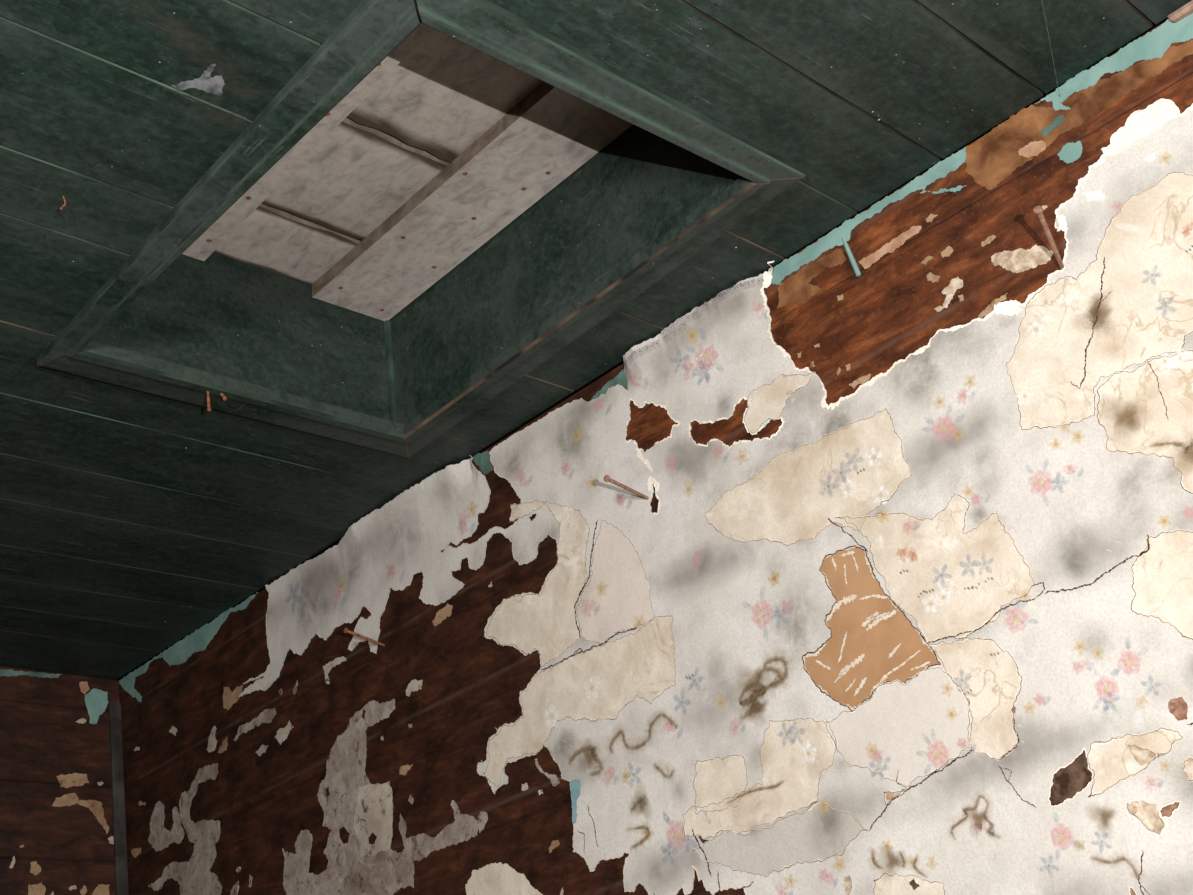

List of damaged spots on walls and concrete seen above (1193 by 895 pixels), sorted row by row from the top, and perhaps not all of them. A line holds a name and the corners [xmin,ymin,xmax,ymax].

peeling [760,13,1193,410]
peeling [591,370,785,515]
crack [541,520,637,670]
crack [828,518,868,552]
crack [926,535,1150,644]
peeling [0,451,649,895]
crack [870,719,1036,829]
peeling [675,865,746,895]